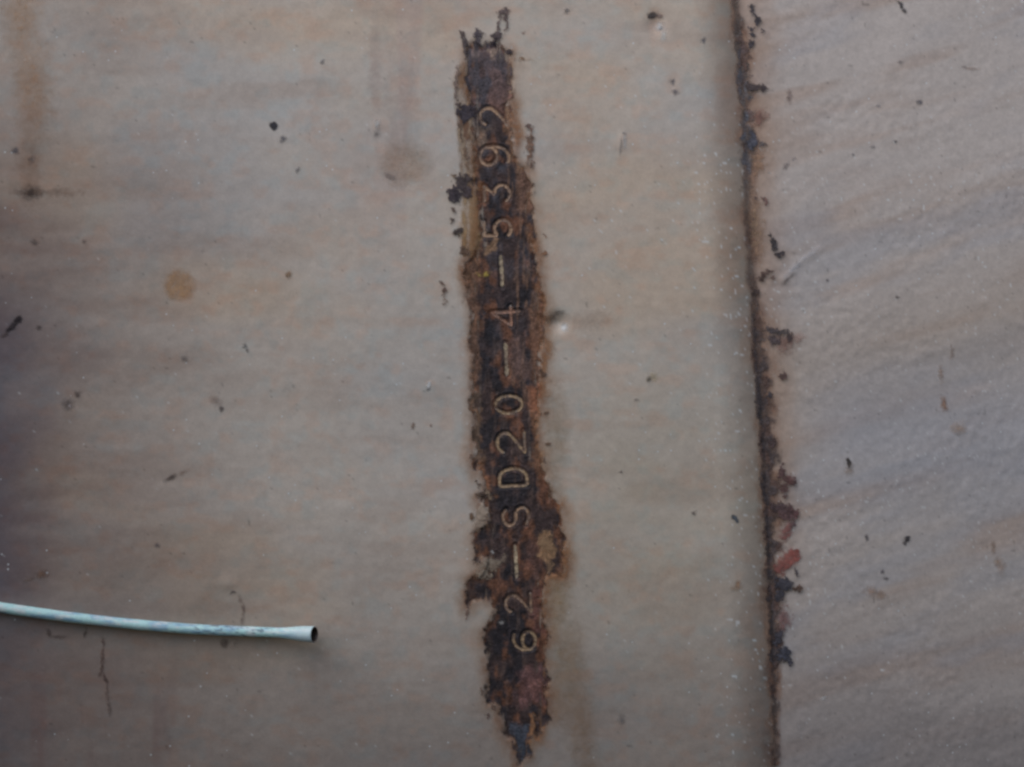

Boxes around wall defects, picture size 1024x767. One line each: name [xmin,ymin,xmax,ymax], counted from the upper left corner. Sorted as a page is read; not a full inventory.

corrosion [732,0,785,261]
corrosion [446,7,572,763]
corrosion [750,269,803,766]